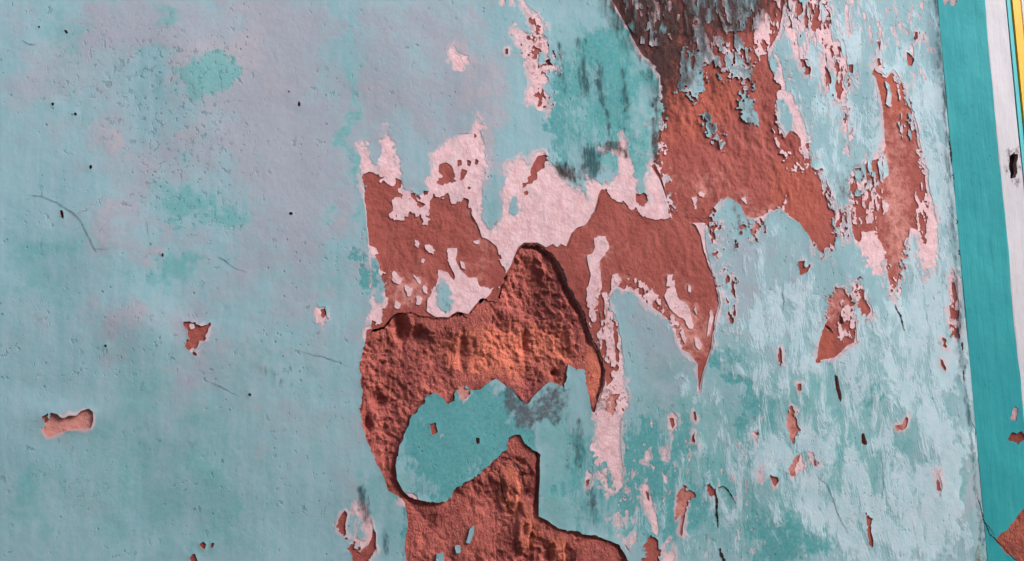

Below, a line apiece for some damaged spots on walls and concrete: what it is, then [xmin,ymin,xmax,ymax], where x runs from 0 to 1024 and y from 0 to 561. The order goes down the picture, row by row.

peeling [355,0,940,561]
peeling [183,321,211,356]
peeling [42,409,93,437]
peeling [336,500,377,561]
peeling [997,509,1024,561]